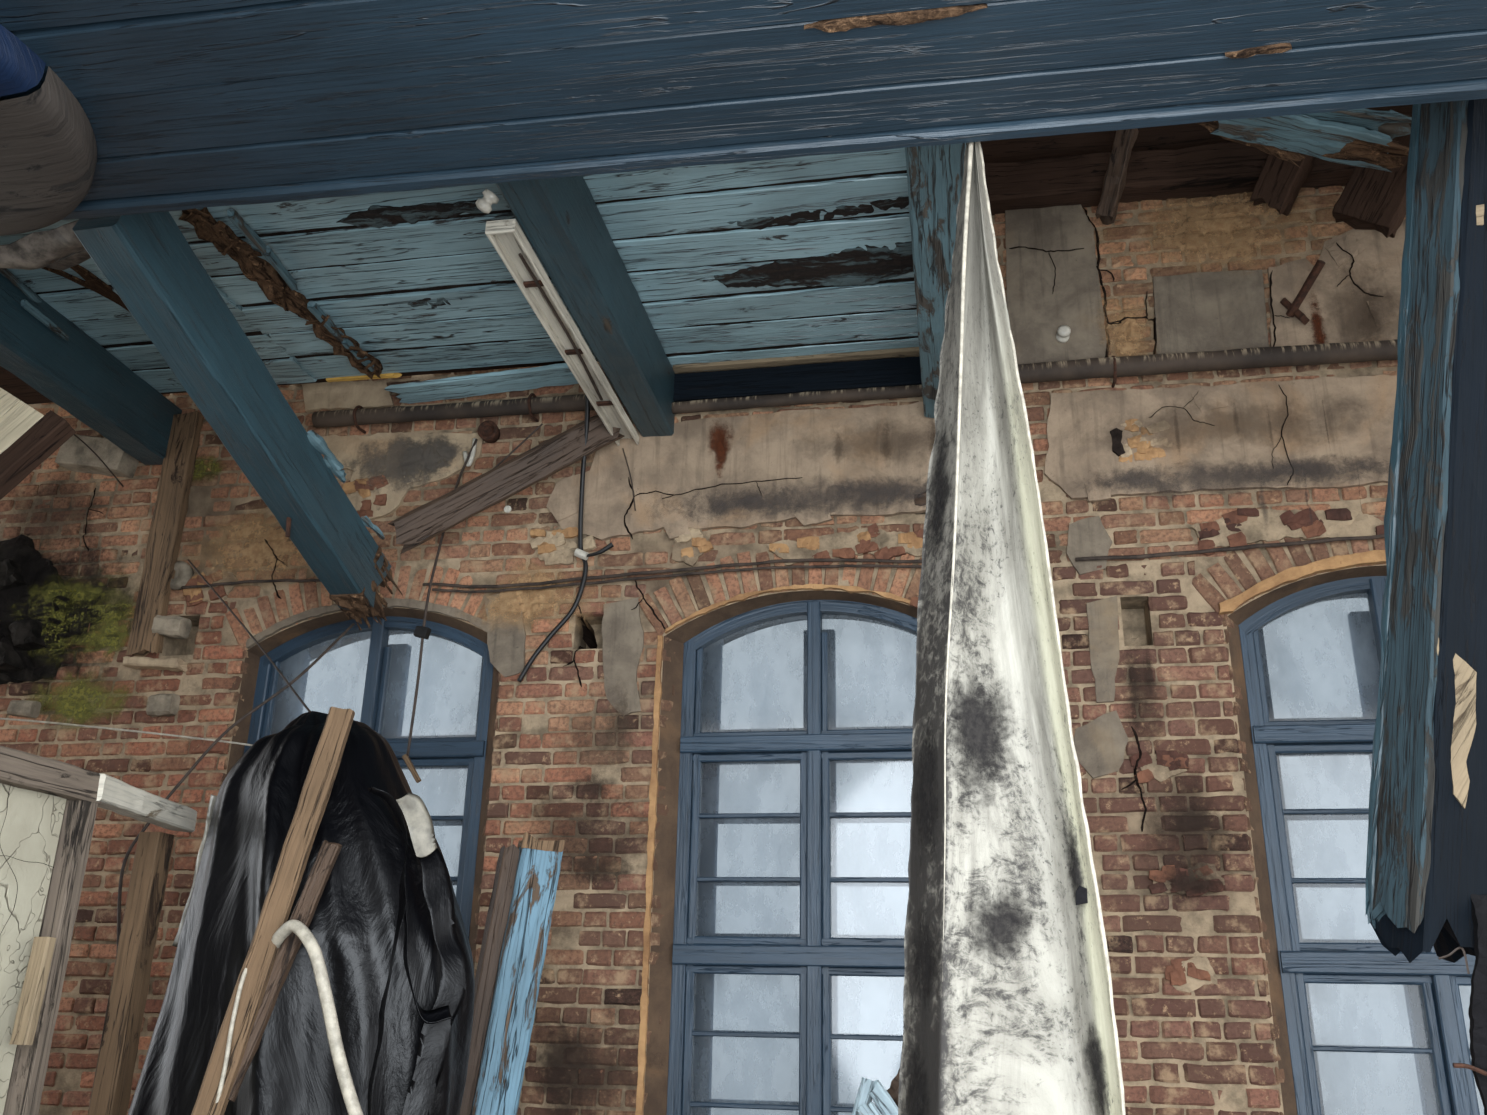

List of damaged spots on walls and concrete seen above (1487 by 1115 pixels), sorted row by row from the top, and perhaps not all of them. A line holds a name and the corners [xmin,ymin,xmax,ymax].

crack [1336,242,1384,297]
crack [1269,270,1289,347]
leakage [351,436,458,490]
crack [1272,385,1294,485]
crack [624,477,802,539]